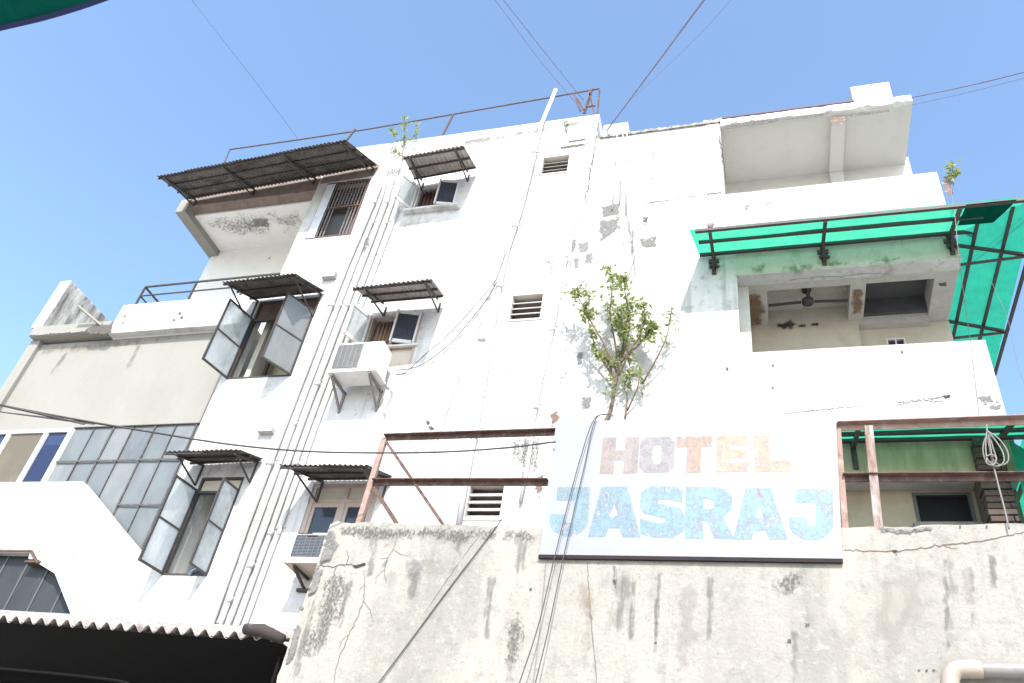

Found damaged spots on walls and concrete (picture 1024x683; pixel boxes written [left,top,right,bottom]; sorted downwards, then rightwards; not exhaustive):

flaking render [722,110,889,129]
flaking render [599,204,621,241]
leakage [341,526,532,542]
crack [848,532,1023,555]
mould [303,576,347,653]
crack [320,530,409,680]
leakage [505,619,524,663]